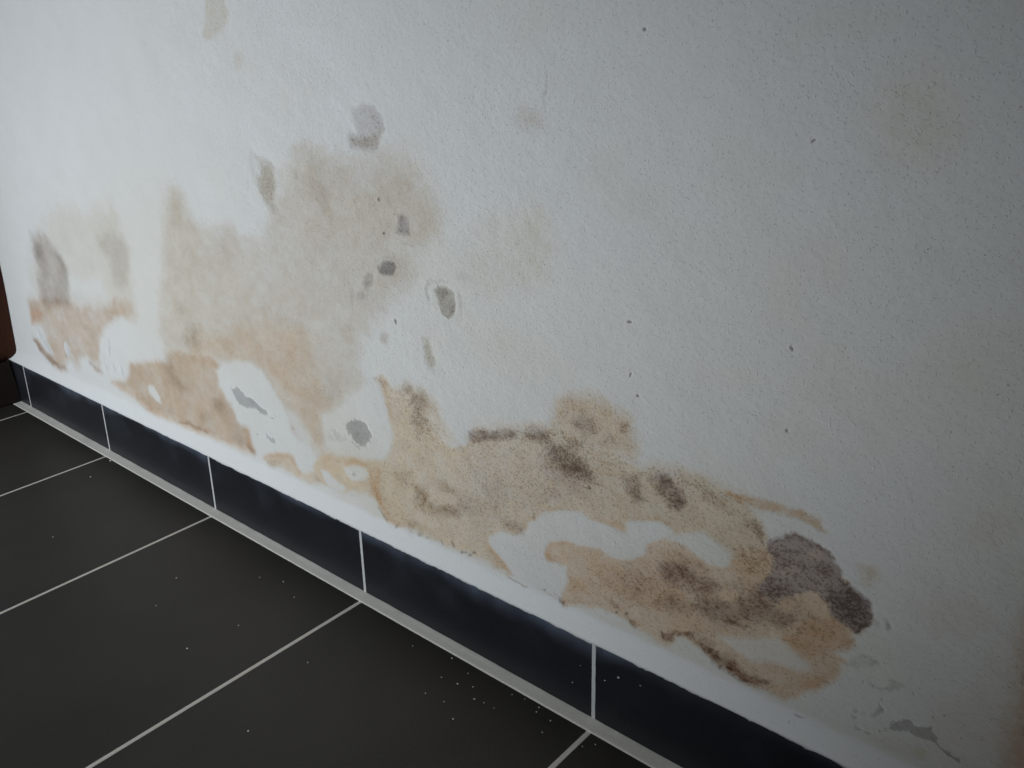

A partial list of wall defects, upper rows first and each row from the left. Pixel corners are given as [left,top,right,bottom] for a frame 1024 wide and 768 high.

peeling [231,384,278,420]
leakage [23,99,894,706]
peeling [326,417,377,452]
peeling [878,713,962,764]